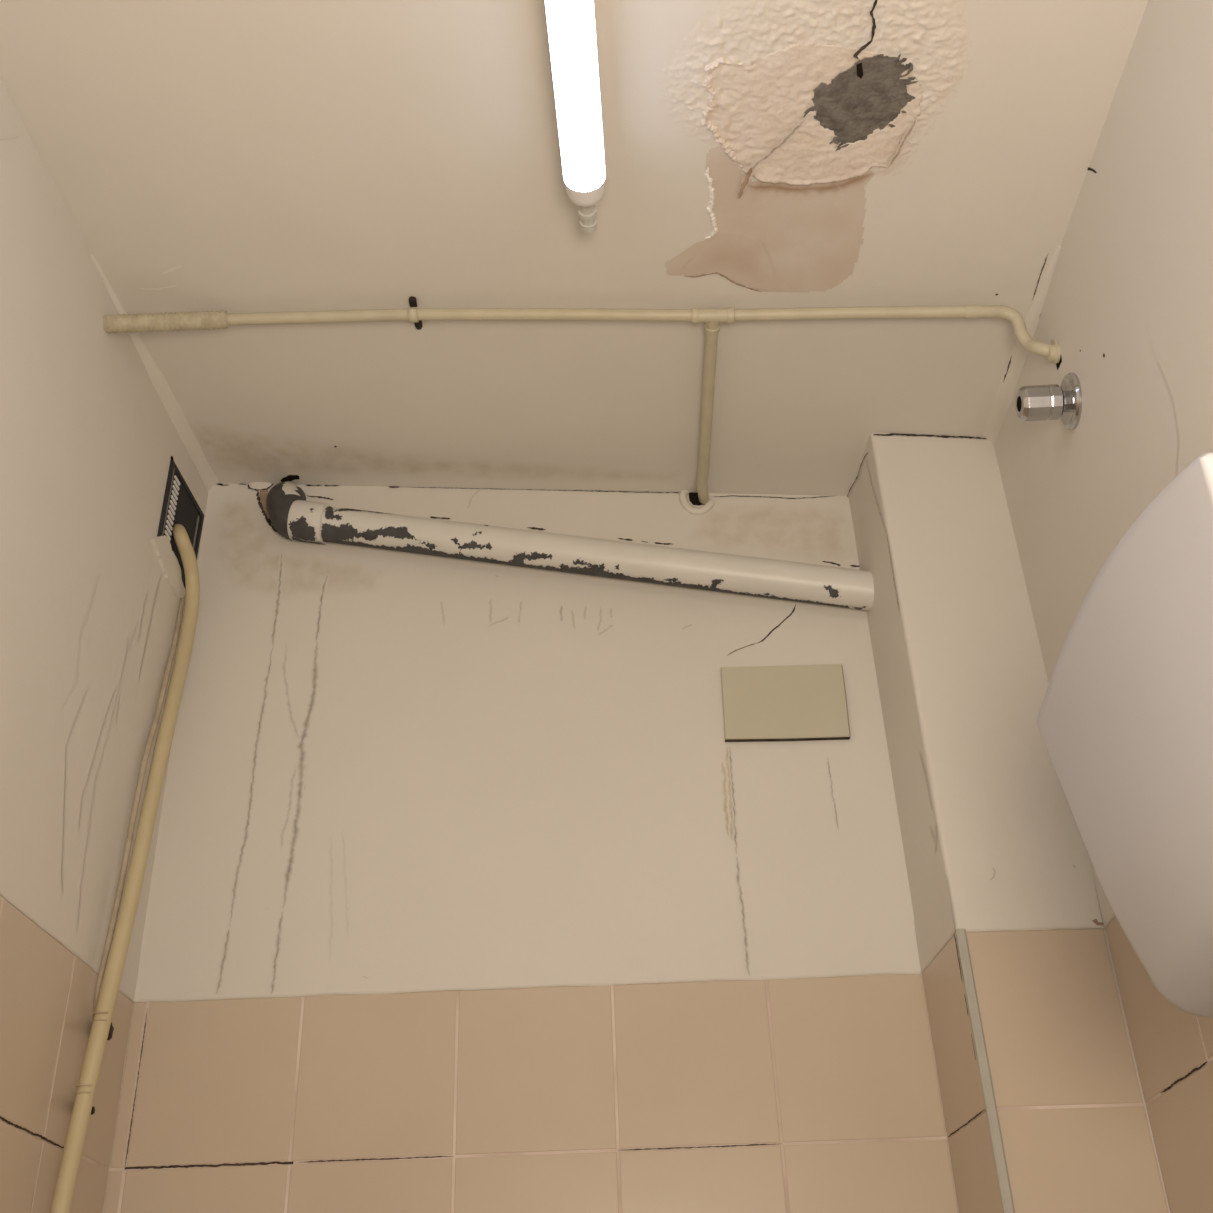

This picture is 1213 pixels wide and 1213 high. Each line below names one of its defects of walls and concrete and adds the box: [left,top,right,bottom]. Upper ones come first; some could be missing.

spalling [656,0,973,293]
peeling [248,475,866,610]
crack [728,604,796,655]